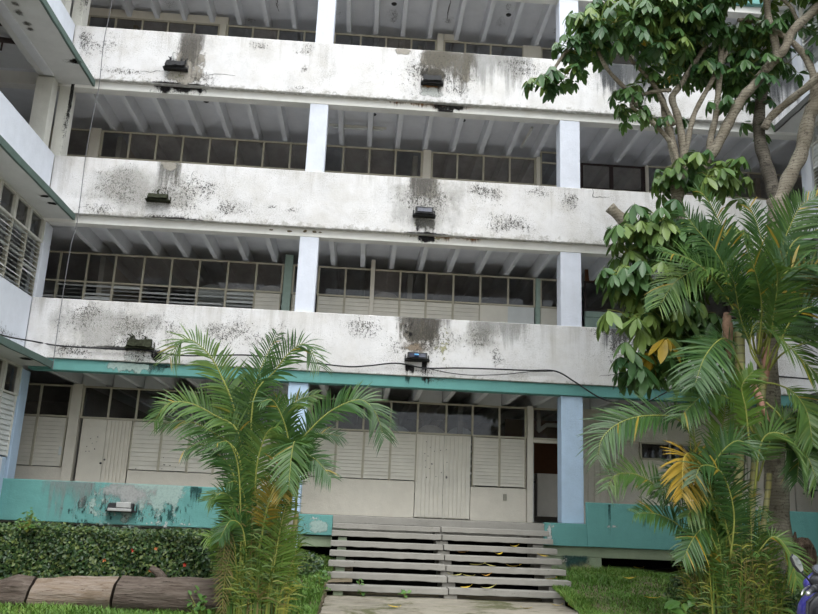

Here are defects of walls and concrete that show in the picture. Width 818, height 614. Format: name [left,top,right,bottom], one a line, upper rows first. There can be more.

leakage [76,162,252,222]
leakage [465,183,535,236]
leakage [54,302,185,374]
leakage [204,315,297,355]
leakage [340,315,391,338]
peeling [55,483,191,528]